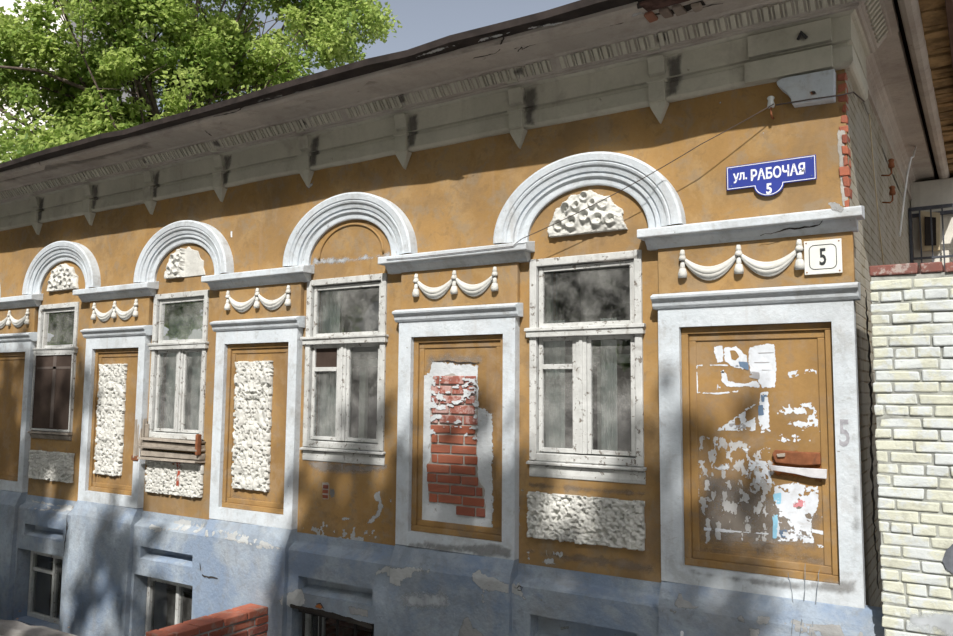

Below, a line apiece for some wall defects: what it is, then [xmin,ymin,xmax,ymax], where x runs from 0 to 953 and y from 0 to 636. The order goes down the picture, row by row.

spalling [632,0,706,23]
leakage [668,55,681,95]
leakage [524,89,536,124]
leakage [408,116,417,146]
crack [760,221,822,236]
spalling [422,362,494,528]
peeling [785,619,844,636]